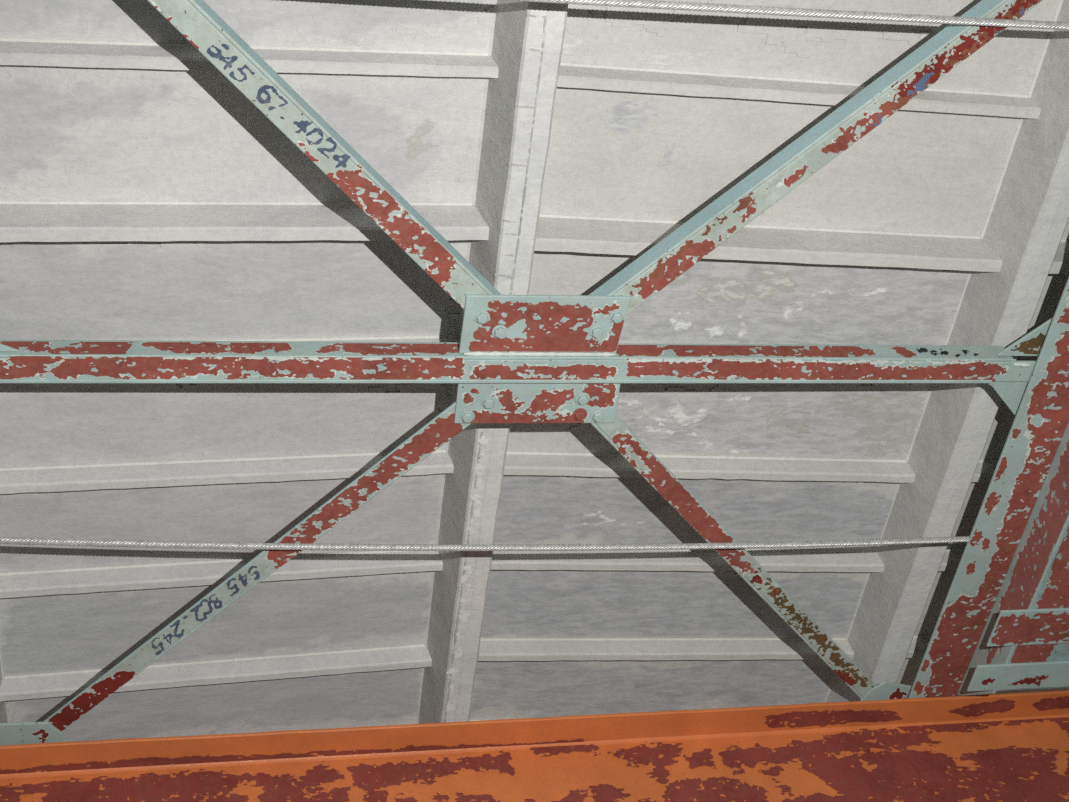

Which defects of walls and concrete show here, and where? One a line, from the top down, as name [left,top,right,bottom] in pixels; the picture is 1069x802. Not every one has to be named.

peeling [821,0,1041,154]
peeling [295,141,463,307]
peeling [626,192,757,301]
peeling [698,269,836,320]
peeling [776,161,809,188]
peeling [0,289,1069,802]
corrosion [751,563,874,688]